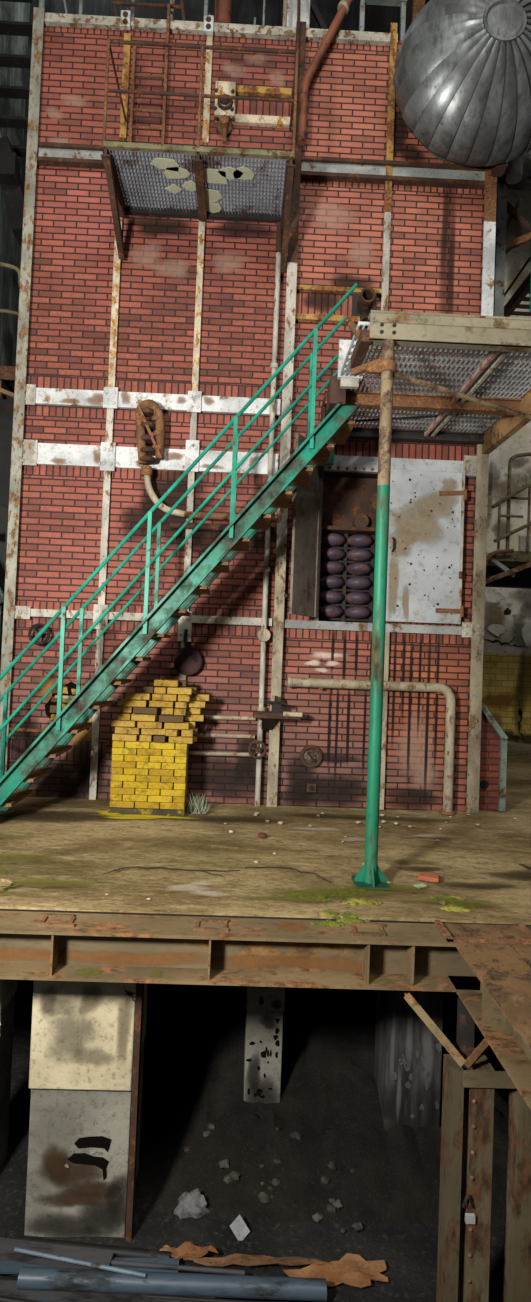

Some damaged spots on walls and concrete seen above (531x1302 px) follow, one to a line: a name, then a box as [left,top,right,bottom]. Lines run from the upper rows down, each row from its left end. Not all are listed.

corrosion [63,395,103,403]
leakage [487,459,531,536]
leakage [485,592,531,644]
corrosion [0,949,197,965]
peeling [246,1018,280,1098]
leakage [35,1178,127,1238]